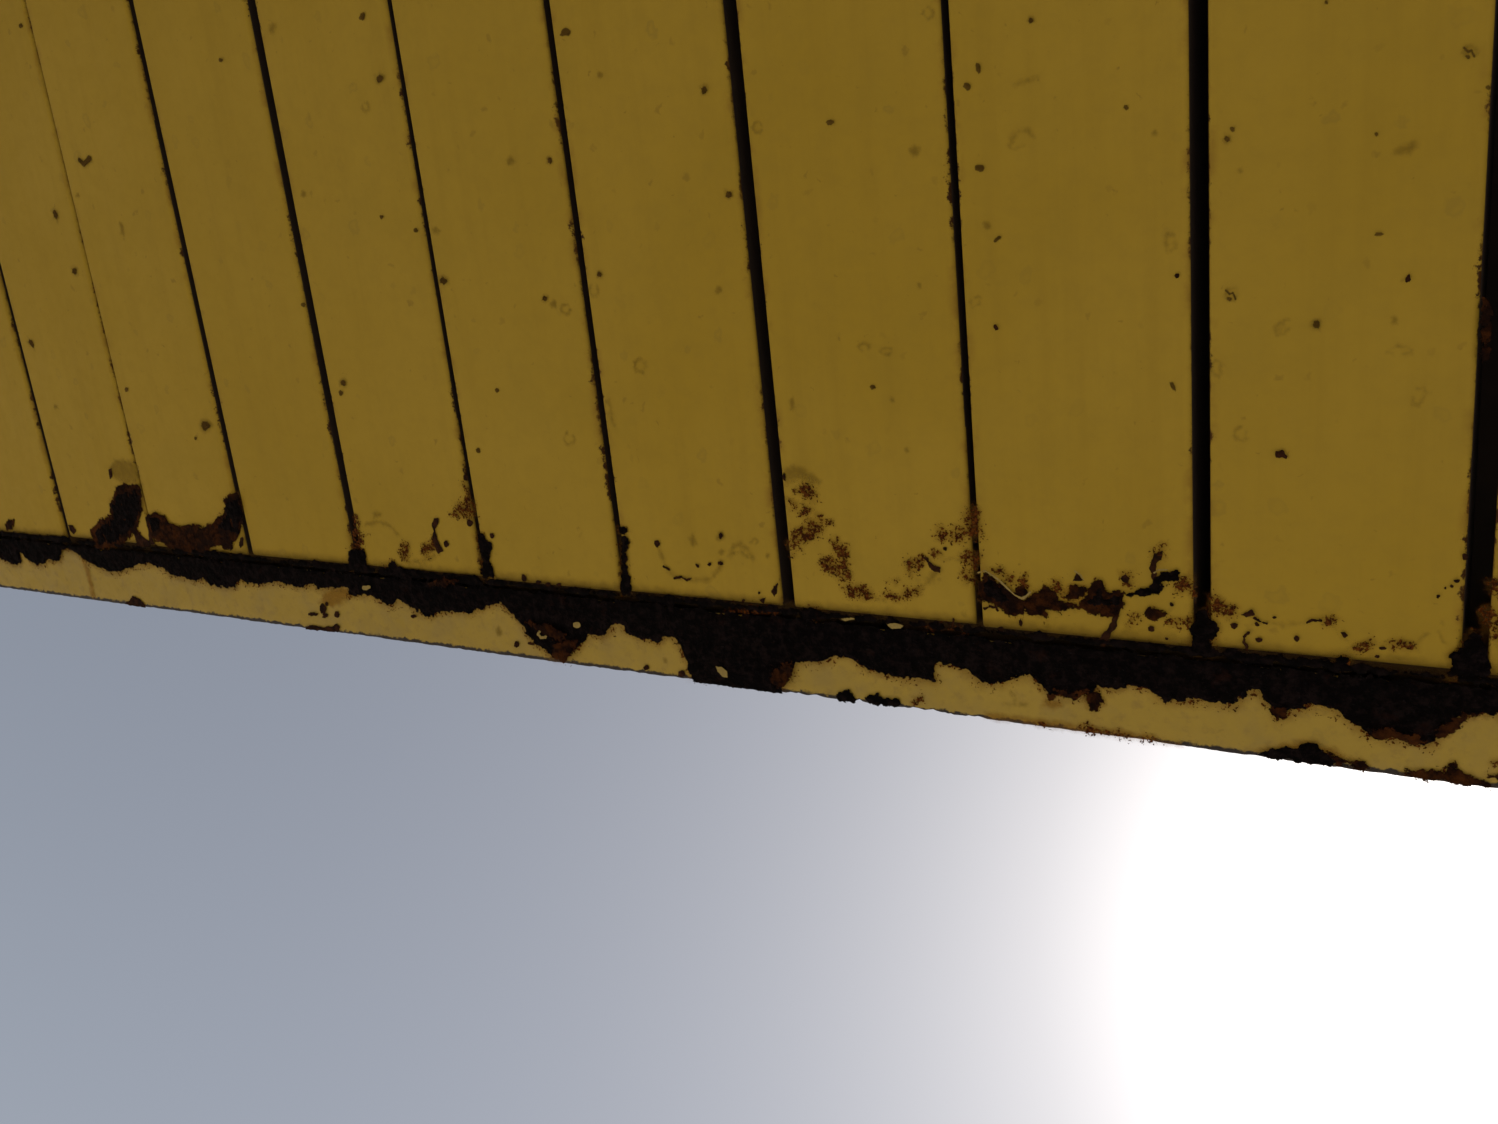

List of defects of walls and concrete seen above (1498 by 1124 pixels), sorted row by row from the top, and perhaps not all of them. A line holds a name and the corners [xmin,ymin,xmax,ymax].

rust [0,468,1498,791]